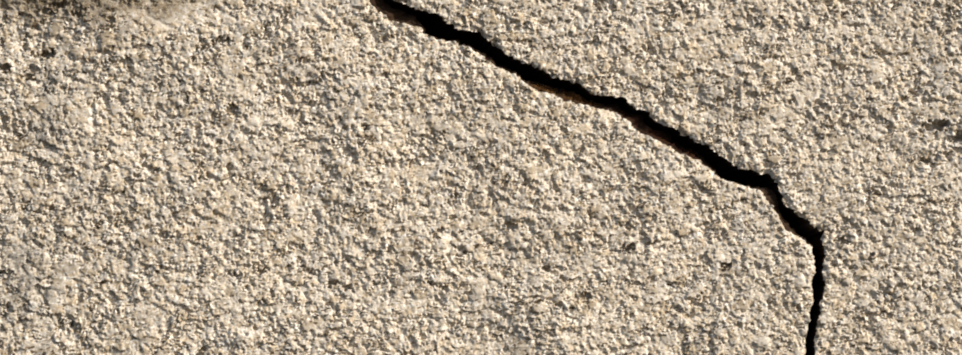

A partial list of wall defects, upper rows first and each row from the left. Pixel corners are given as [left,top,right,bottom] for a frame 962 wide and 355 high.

crack [369,0,826,355]